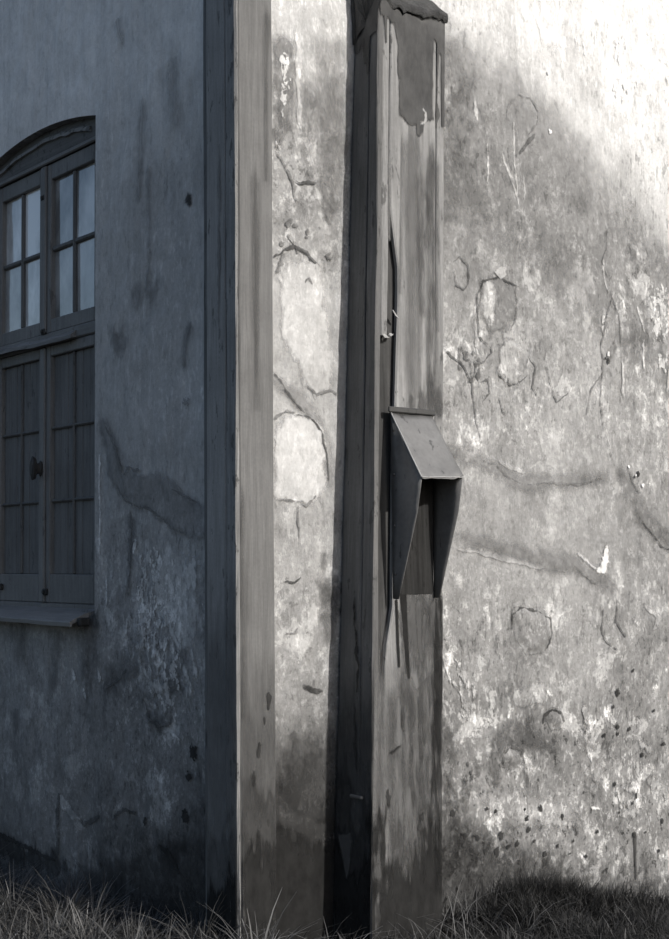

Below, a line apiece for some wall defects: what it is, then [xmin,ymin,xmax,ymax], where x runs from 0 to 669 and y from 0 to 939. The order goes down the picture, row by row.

peeling [274,34,302,148]
crack [274,234,317,273]
crack [454,256,470,290]
crack [444,330,504,442]
crack [527,229,669,550]
peeling [622,283,669,391]
crack [100,420,205,539]
crack [273,374,337,538]
spalling [578,547,610,574]
water stain [73,581,669,939]